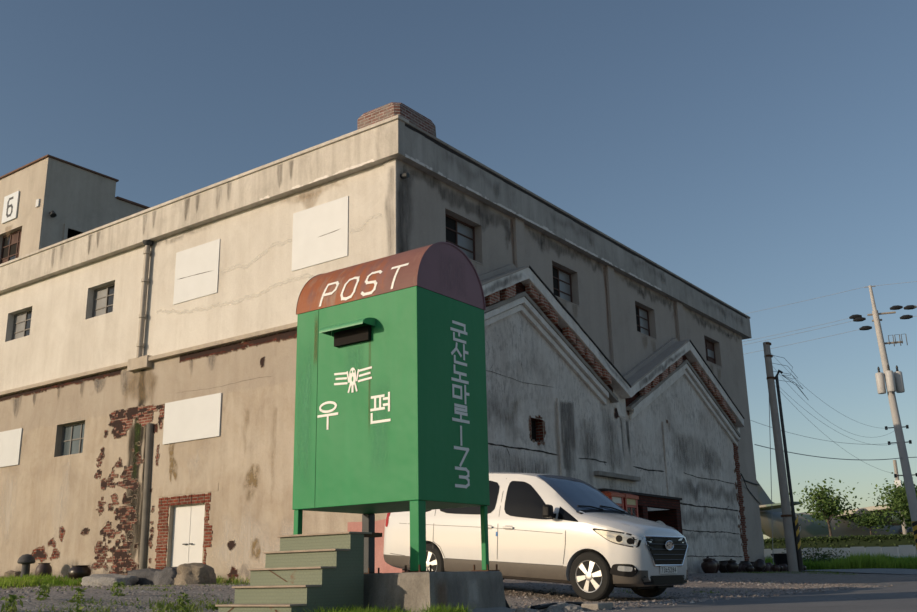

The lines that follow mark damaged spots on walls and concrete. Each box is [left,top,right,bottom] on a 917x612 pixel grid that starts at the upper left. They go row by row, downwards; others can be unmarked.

spalling [31,526,66,563]
spalling [81,404,177,575]